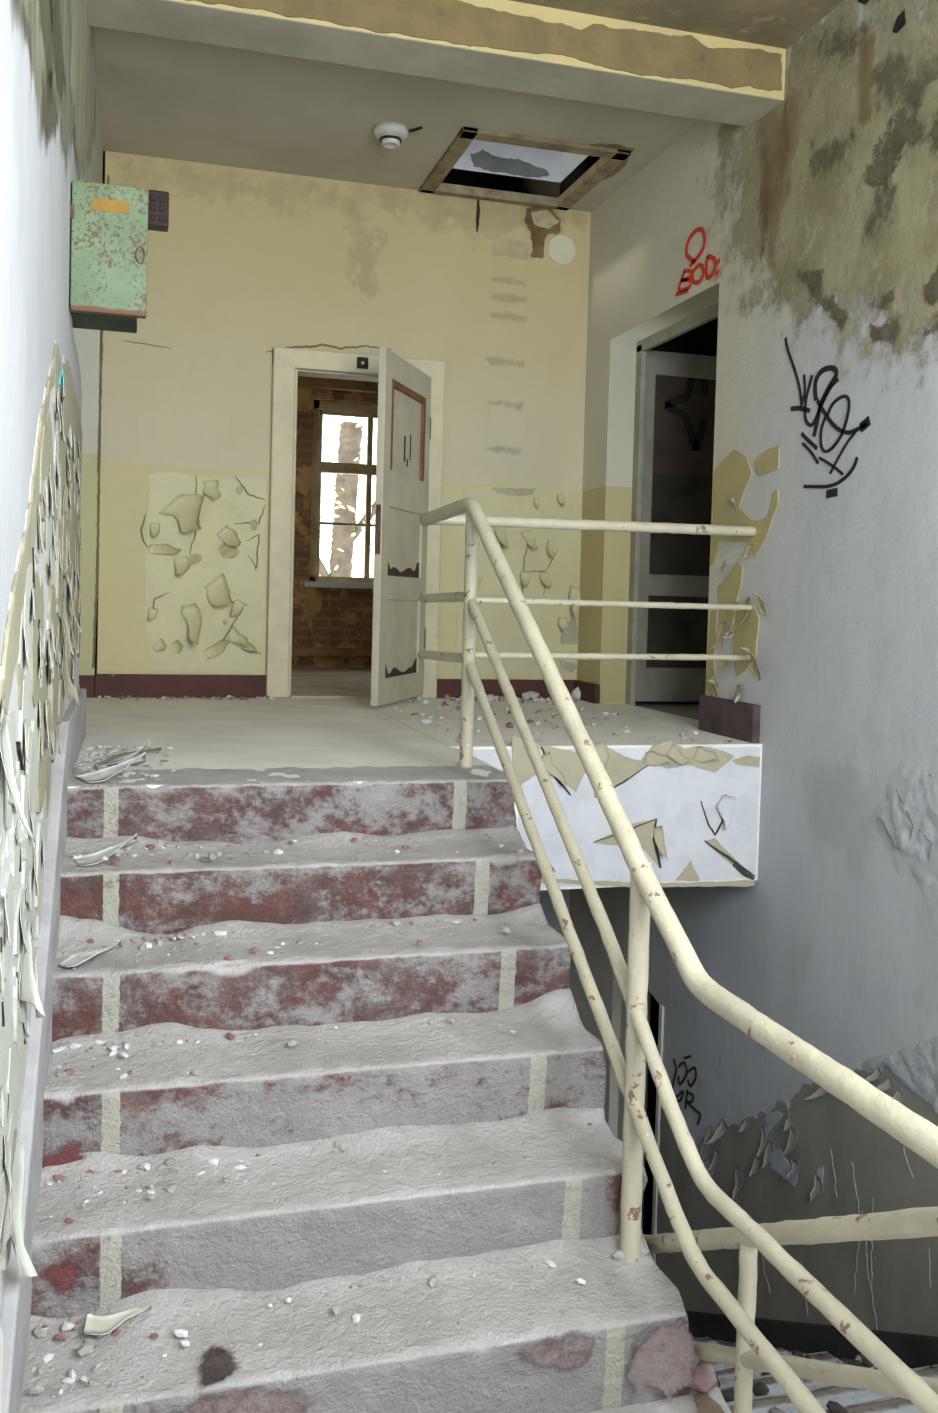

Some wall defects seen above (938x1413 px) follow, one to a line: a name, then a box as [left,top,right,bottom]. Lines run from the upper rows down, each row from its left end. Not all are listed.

mould [11,0,96,181]
flaking render [186,0,782,91]
water stain [716,0,938,366]
peeling [140,472,267,675]
peeling [706,446,780,703]
peeling [0,340,84,1413]
peeling [472,735,630,888]
peeling [594,740,761,887]
peeling [657,1081,938,1234]
peeling [853,1066,938,1127]
peeling [755,1250,833,1326]
peeling [780,1236,938,1337]